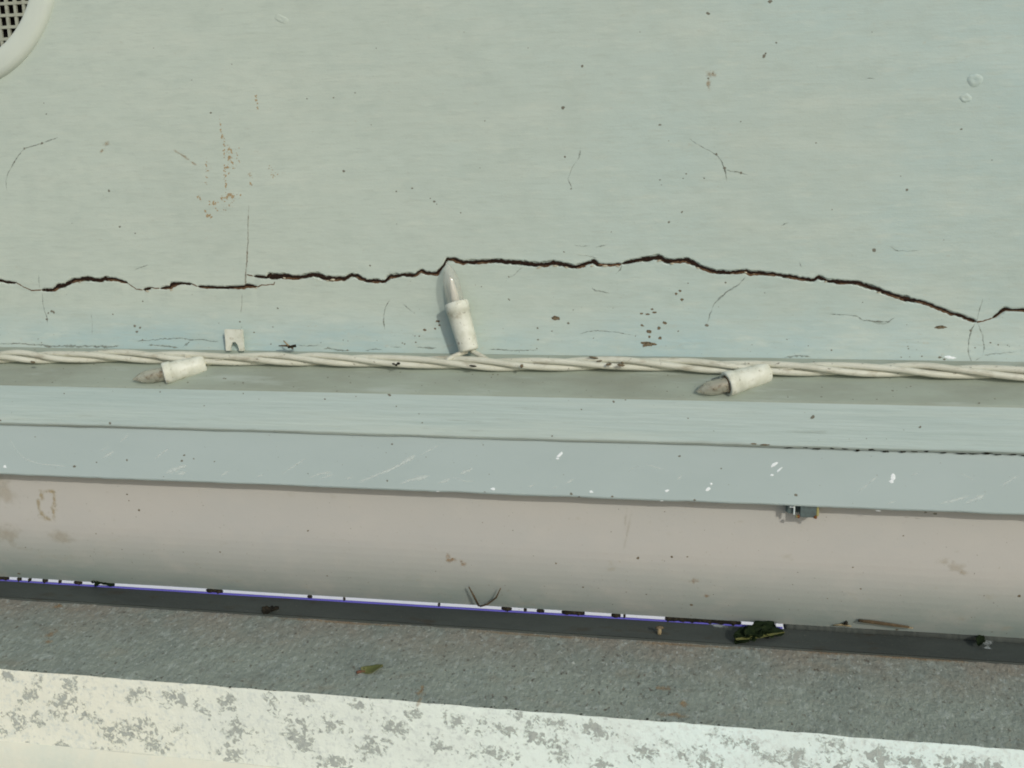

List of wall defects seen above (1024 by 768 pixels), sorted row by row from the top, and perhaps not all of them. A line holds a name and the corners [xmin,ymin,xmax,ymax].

crack [0,245,1024,360]